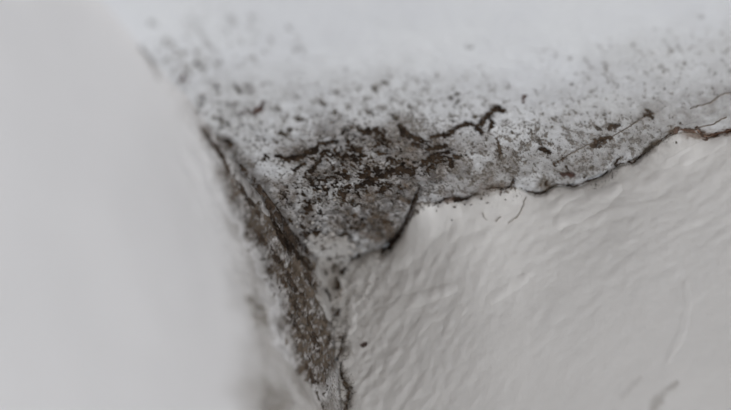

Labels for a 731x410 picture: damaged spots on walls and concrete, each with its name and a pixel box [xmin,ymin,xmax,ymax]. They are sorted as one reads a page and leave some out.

leakage [195,15,731,410]
peeling [517,173,541,191]